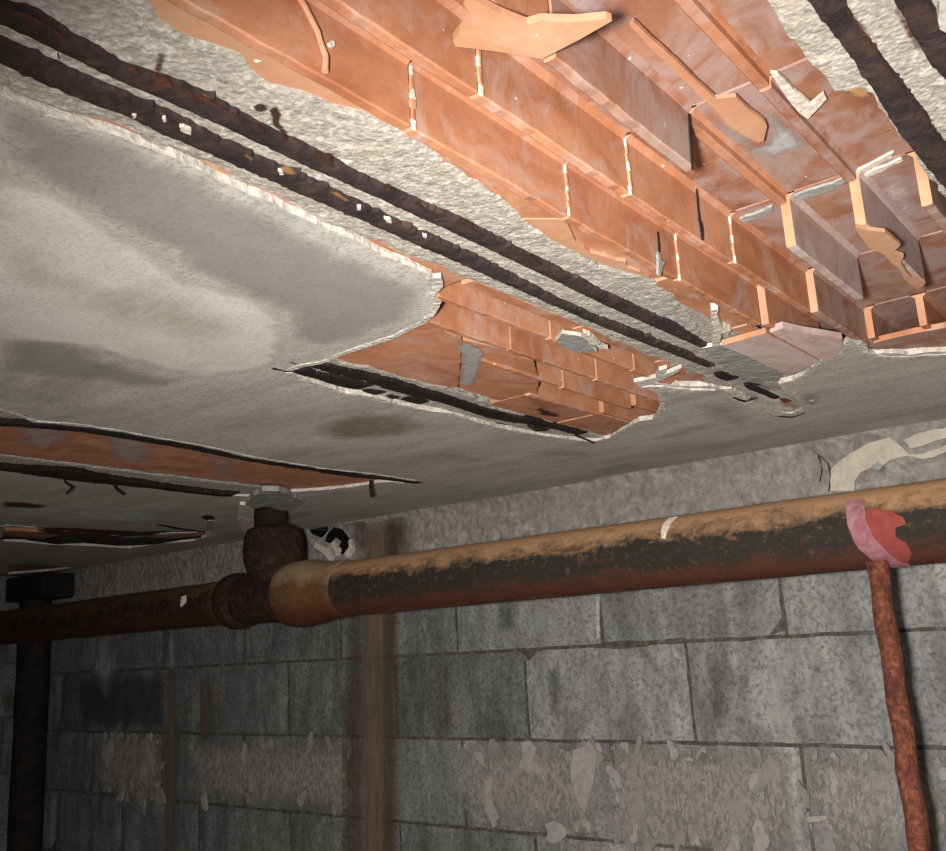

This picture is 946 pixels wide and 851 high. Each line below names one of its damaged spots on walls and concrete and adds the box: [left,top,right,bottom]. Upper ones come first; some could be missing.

rust [153,54,232,115]
rust [243,104,287,140]
spalling [807,0,946,189]
rust [314,152,335,168]
spalling [0,0,827,442]
rust [457,219,476,231]
spalling [835,338,946,357]
spalling [0,409,423,497]
peeling [830,428,946,492]
spalling [111,515,215,538]
peeling [450,734,906,851]
peeling [921,755,946,846]